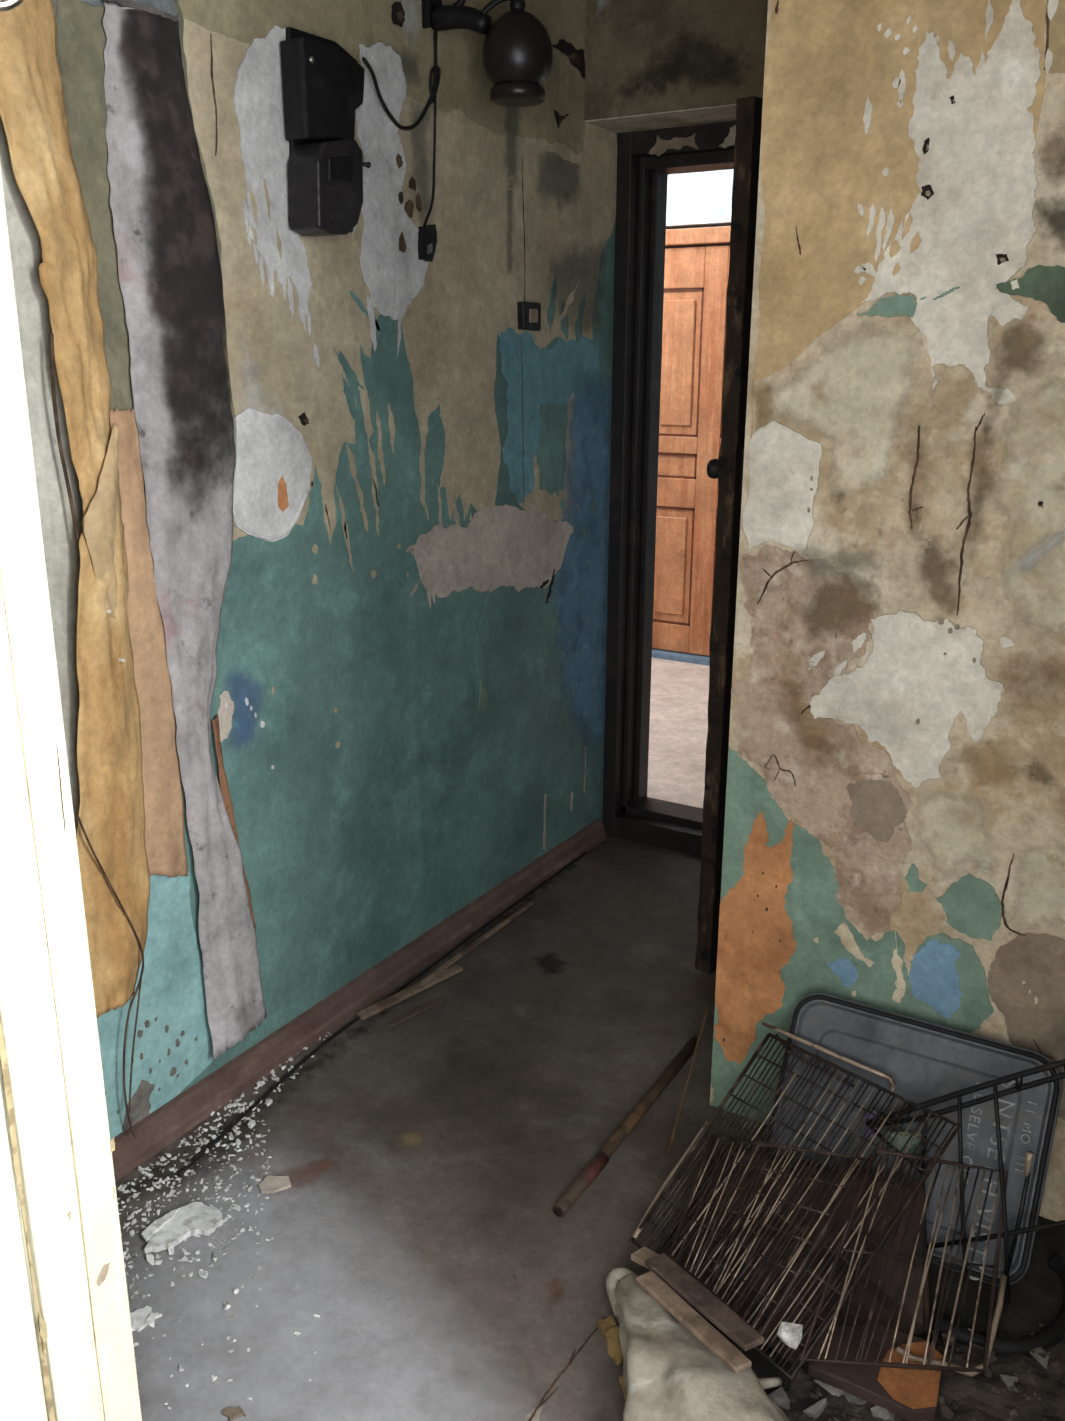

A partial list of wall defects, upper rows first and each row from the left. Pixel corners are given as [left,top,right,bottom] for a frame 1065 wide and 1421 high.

peeling [1047,0,1059,21]
peeling [877,15,918,108]
peeling [863,95,873,135]
flaking render [921,185,934,200]
peeling [243,199,320,368]
peeling [854,199,904,286]
peeling [858,294,917,317]
flaking render [995,254,1009,265]
peeling [996,265,1065,323]
crack [908,425,923,529]
crack [956,413,986,615]
flaking render [710,545,1065,1124]